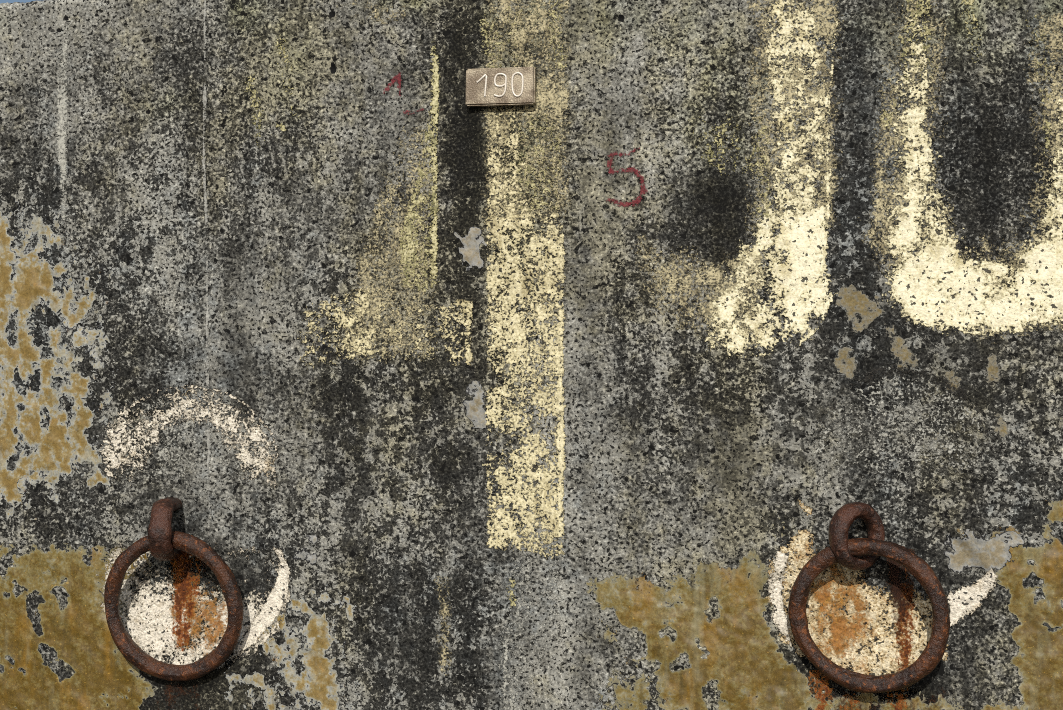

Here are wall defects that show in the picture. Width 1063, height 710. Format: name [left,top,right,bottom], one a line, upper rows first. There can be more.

leakage [454,226,489,271]
leakage [462,380,487,429]
spalling [809,366,996,486]
rust [170,550,228,655]
leakage [224,584,361,710]
leakage [436,576,451,675]
spalling [766,529,819,670]
rust [808,670,862,710]
rust [810,564,871,660]
spalling [806,563,933,676]
rust [887,558,917,671]
spalling [946,568,999,627]